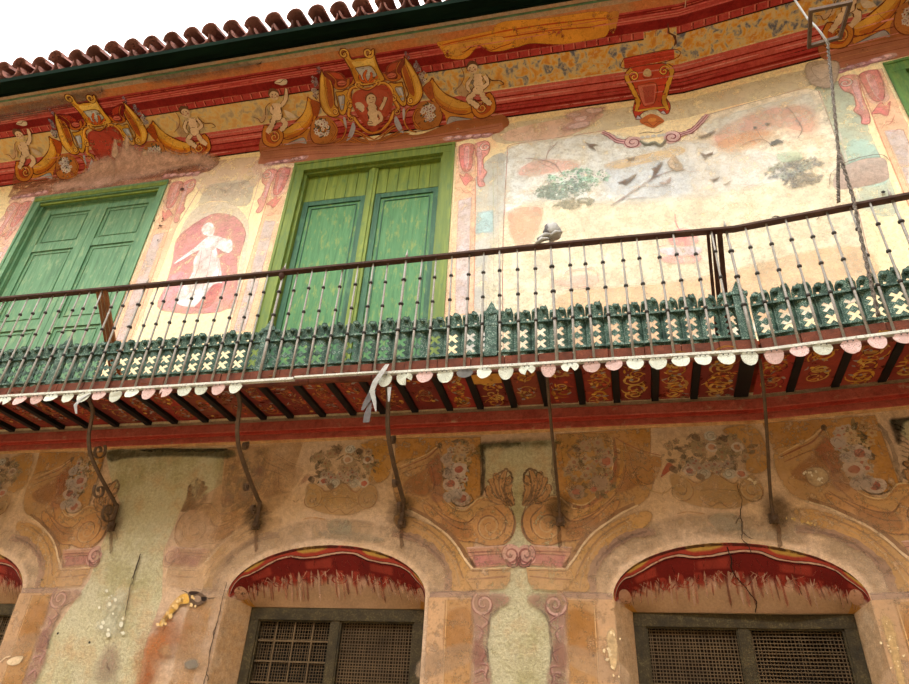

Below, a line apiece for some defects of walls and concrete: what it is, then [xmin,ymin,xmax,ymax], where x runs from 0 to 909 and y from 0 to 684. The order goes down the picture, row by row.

peeling [51,136,215,191]
crack [727,485,757,613]
crack [203,582,227,684]